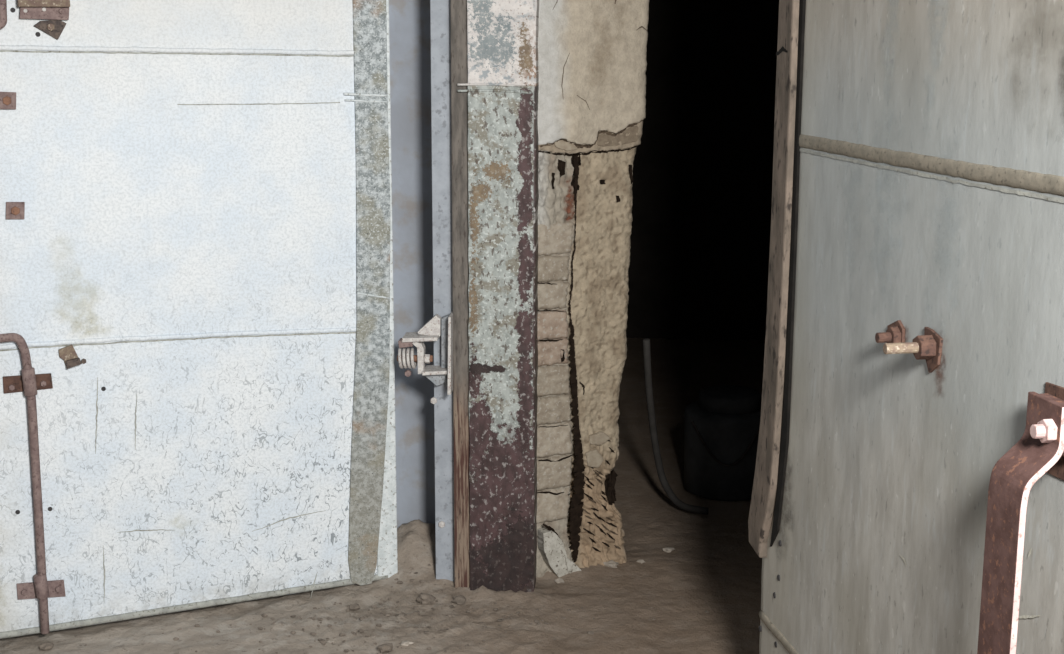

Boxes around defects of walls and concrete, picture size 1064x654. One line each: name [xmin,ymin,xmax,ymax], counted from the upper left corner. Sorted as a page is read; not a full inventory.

flaking render [467,0,643,592]